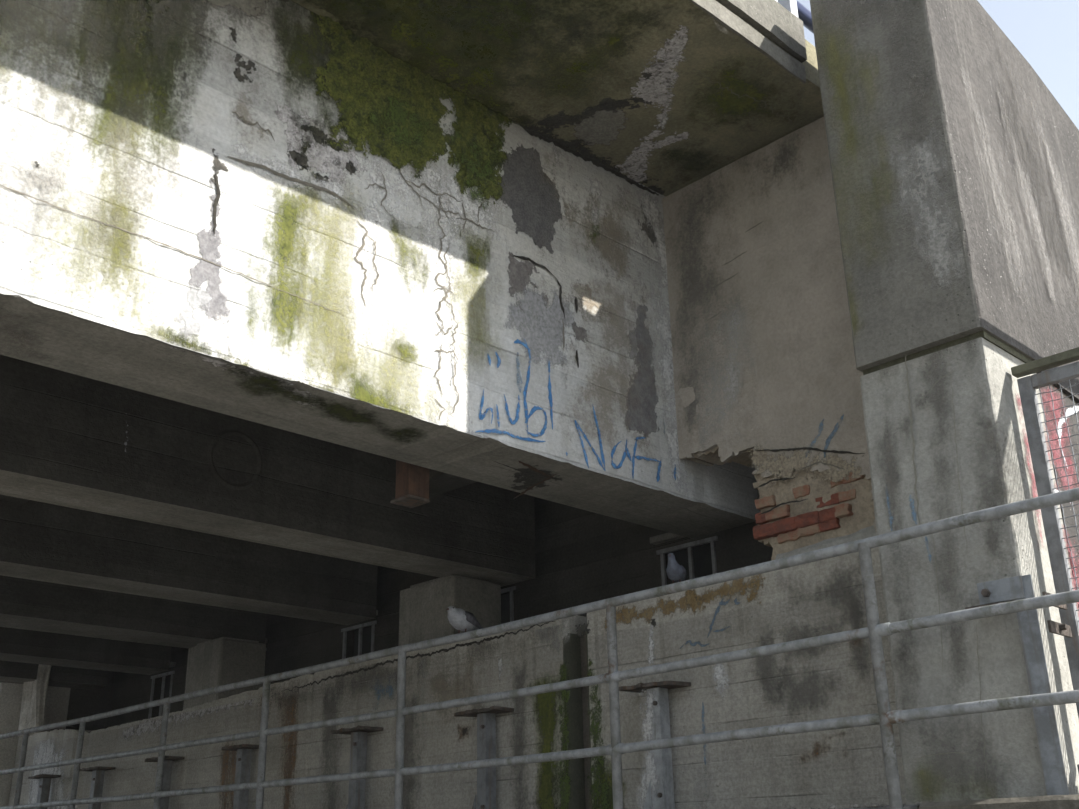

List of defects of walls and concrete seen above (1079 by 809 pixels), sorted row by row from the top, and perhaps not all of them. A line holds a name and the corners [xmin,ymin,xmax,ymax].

crack [0,184,348,317]
crack [211,145,498,234]
peeling [500,144,562,254]
water stain [903,73,963,275]
peeling [507,252,587,366]
spalling [747,444,865,544]
corrosion [278,691,298,809]